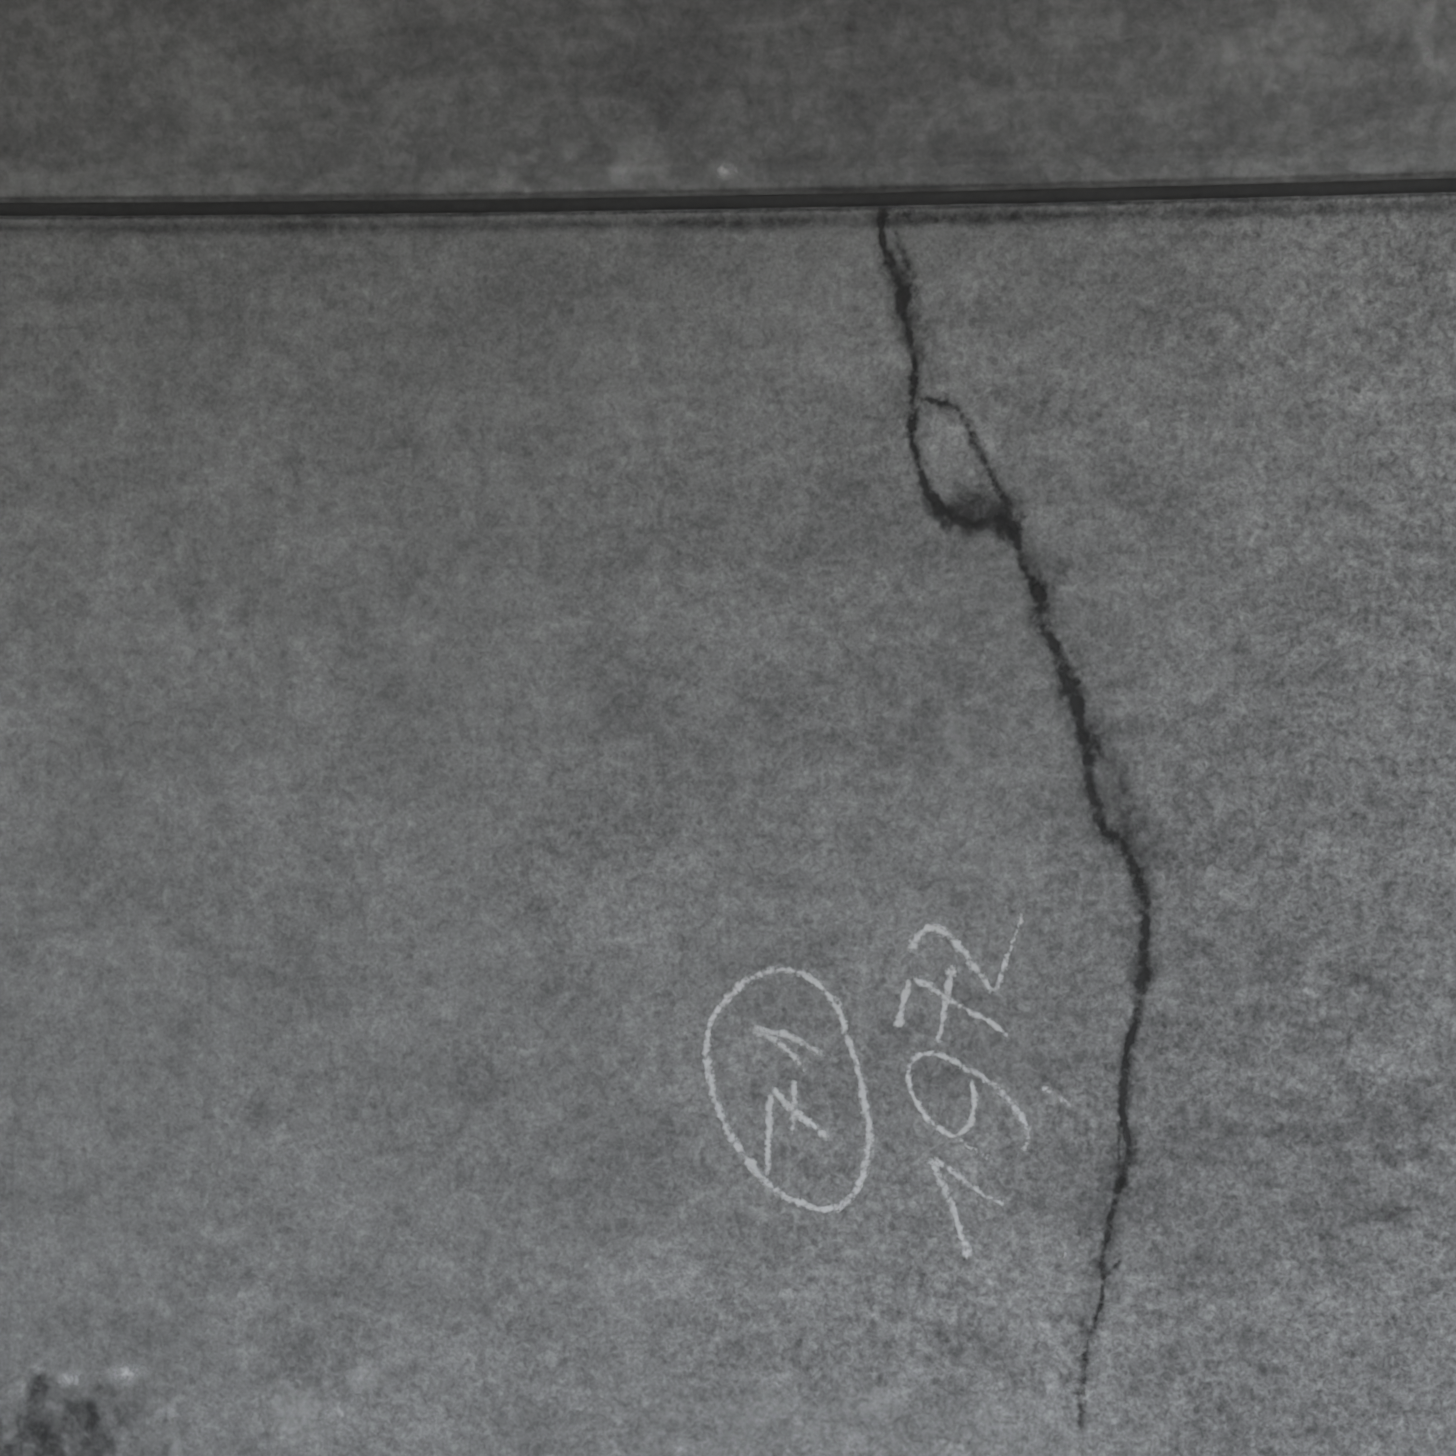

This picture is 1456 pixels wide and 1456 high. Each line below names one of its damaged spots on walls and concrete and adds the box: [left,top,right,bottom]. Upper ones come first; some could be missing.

crack [877,208,1156,1427]